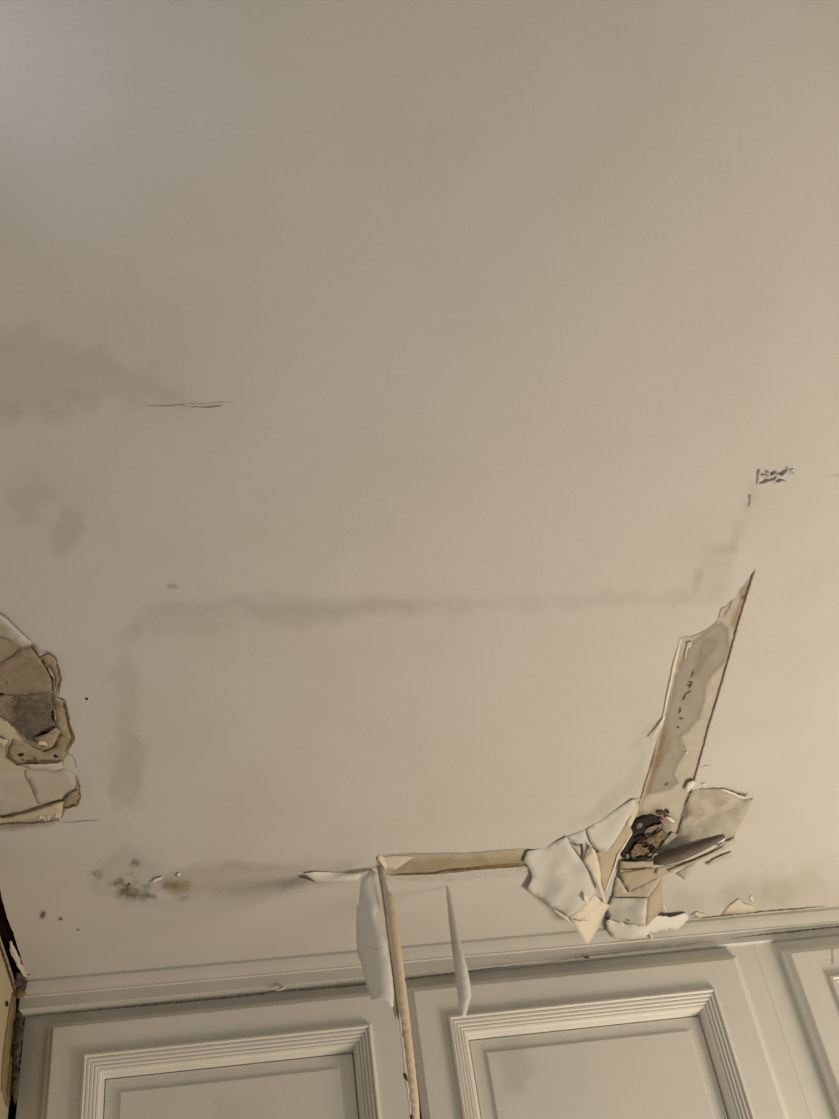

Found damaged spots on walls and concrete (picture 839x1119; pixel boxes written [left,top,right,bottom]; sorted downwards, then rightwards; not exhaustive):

peeling [0,613,98,826]